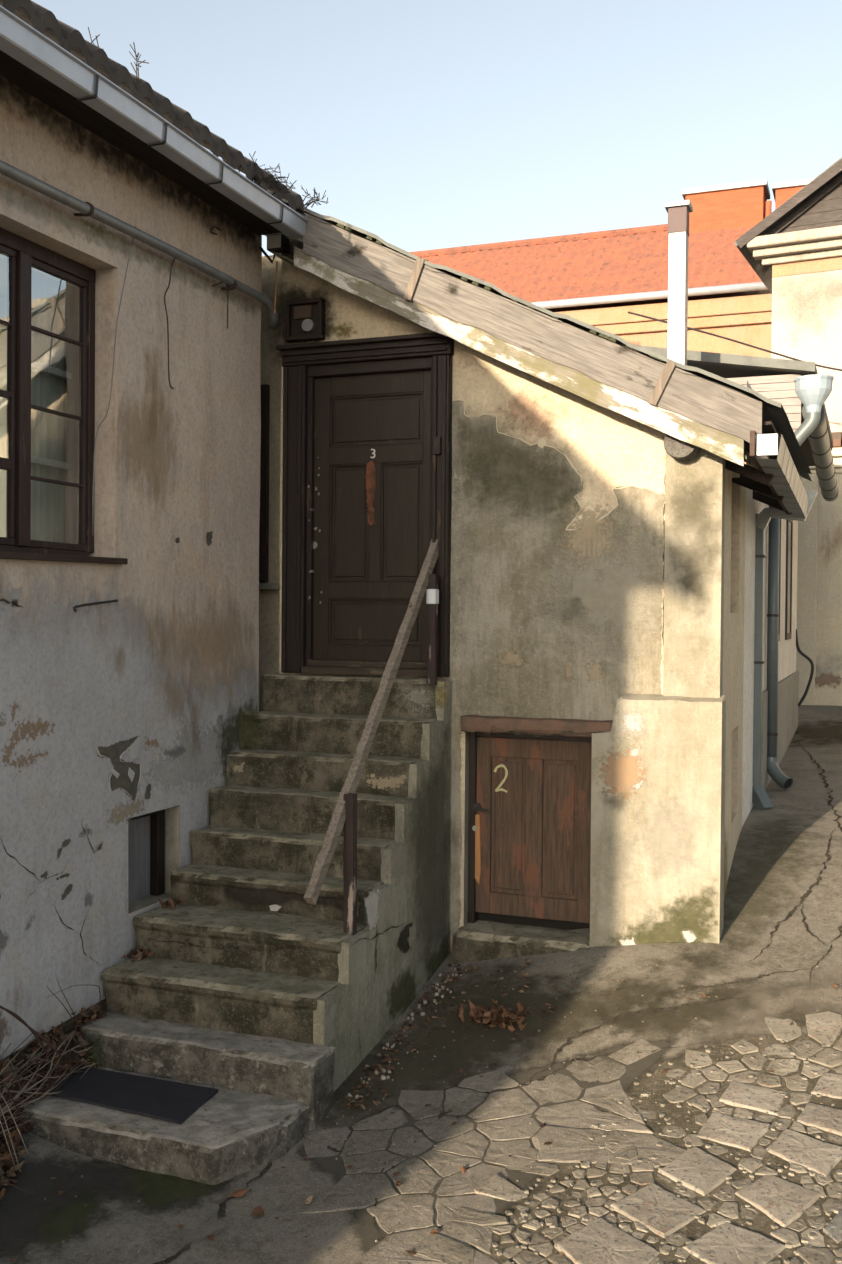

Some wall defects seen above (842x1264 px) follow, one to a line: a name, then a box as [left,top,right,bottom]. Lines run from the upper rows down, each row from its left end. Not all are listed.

peeling [446,399,665,951]
peeling [0,703,55,772]
spalling [95,736,185,825]
spalling [41,871,73,900]